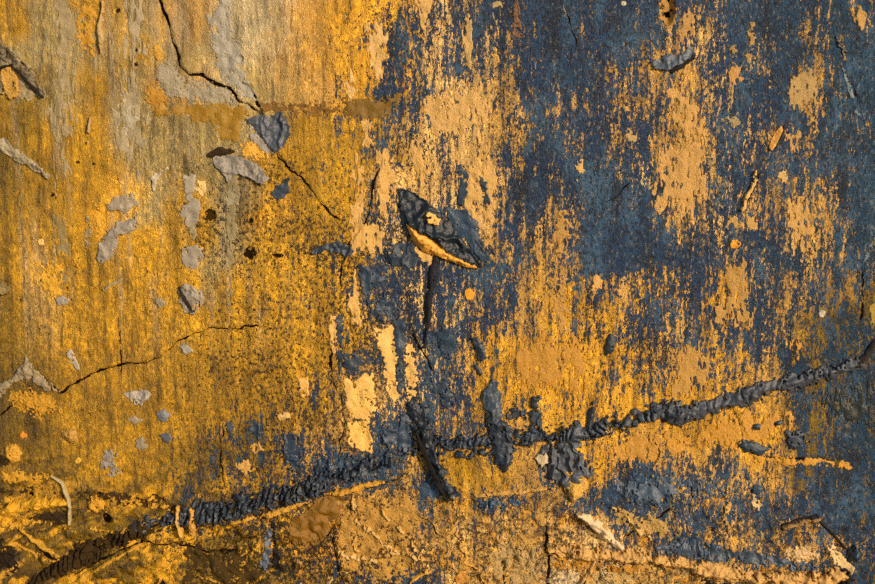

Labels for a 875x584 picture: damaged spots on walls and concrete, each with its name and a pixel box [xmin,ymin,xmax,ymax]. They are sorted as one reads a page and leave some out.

peeling [0,42,45,100]
crack [159,0,262,114]
peeling [452,158,500,244]
peeling [311,119,483,354]
crack [44,287,274,394]
peeling [2,468,53,486]
peeling [14,523,64,561]
peeling [80,495,112,516]
spalling [235,442,264,476]
spalling [286,489,427,584]
spalling [591,495,687,540]
peeling [784,544,855,575]